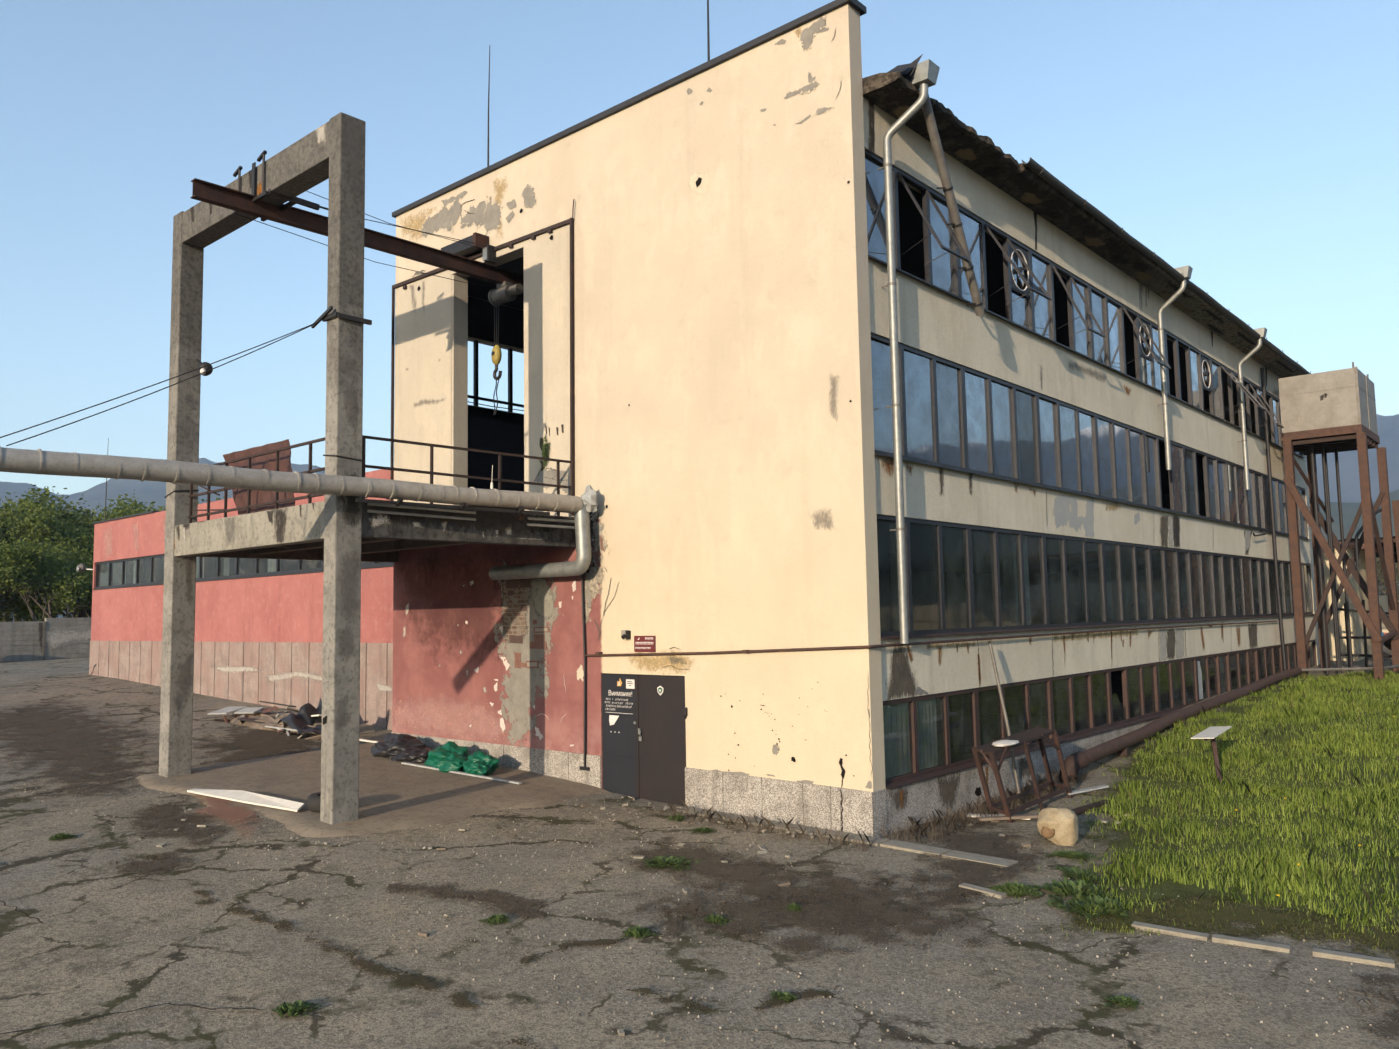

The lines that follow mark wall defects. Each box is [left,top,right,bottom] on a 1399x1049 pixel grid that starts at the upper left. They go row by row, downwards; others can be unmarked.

flaking render [775,16,836,51]
flaking render [784,72,820,99]
flaking render [796,85,841,124]
flaking render [422,185,536,238]
peeling [1053,492,1118,541]
spalling [466,561,567,747]
leakage [888,645,928,702]